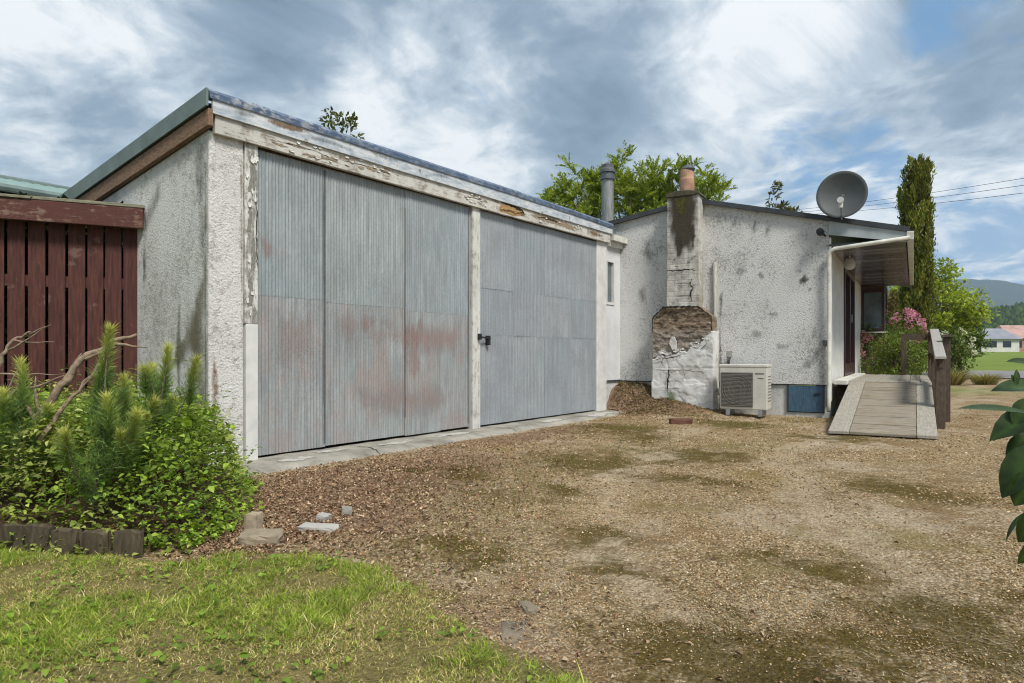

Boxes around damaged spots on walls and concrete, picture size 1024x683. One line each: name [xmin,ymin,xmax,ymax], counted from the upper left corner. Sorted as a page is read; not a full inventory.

peeling [271,139,391,173]
peeling [245,152,259,319]
peeling [502,202,580,230]
damp [668,195,696,256]
crack [667,269,695,302]
damp [174,277,206,401]
flaking render [652,305,712,359]
crack [656,344,710,391]